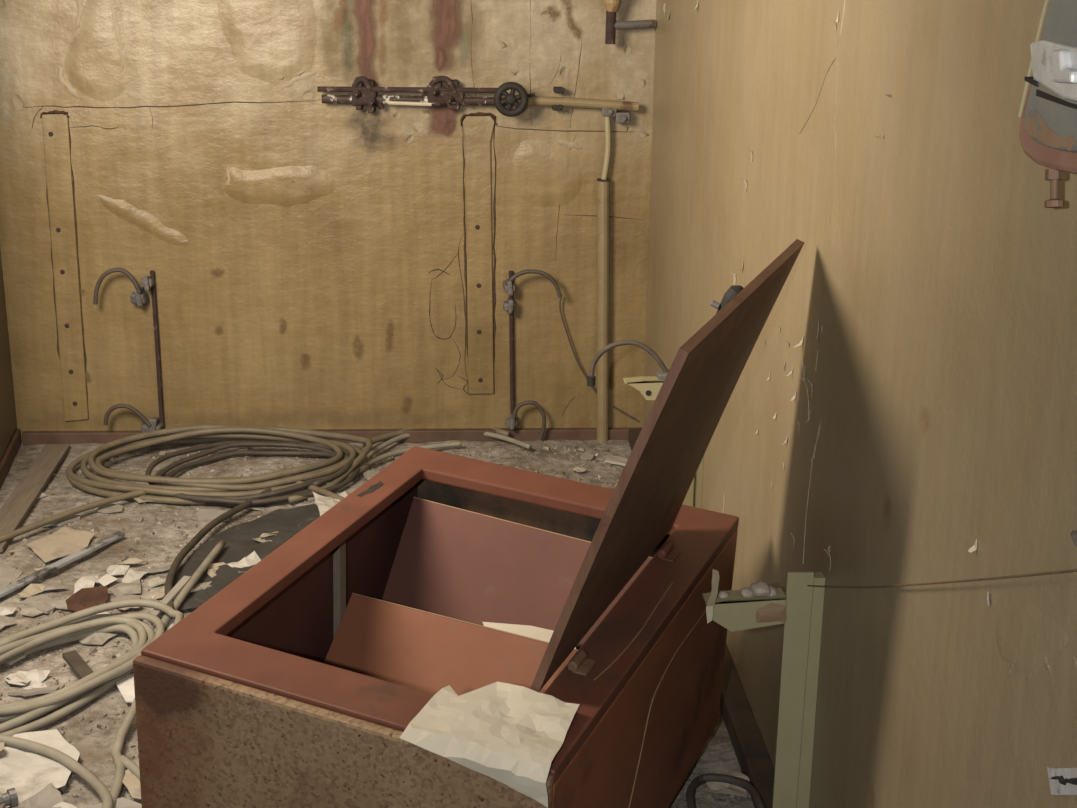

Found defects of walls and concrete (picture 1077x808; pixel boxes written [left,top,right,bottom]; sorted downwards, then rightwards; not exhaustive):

rust [336,0,384,85]
rust [432,0,461,70]
crack [799,0,845,153]
rust [431,105,457,135]